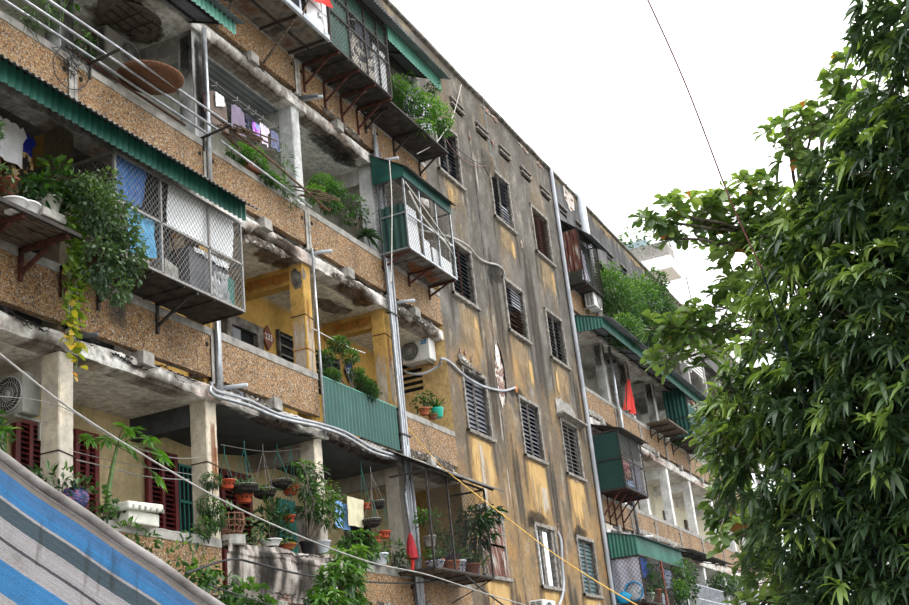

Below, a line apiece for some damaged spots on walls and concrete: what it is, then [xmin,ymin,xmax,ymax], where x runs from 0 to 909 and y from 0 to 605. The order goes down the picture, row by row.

spalling [96,0,162,41]
flaking render [494,341,507,407]
water stain [467,435,499,505]
water stain [511,435,589,544]
water stain [483,581,521,605]
water stain [540,579,604,605]